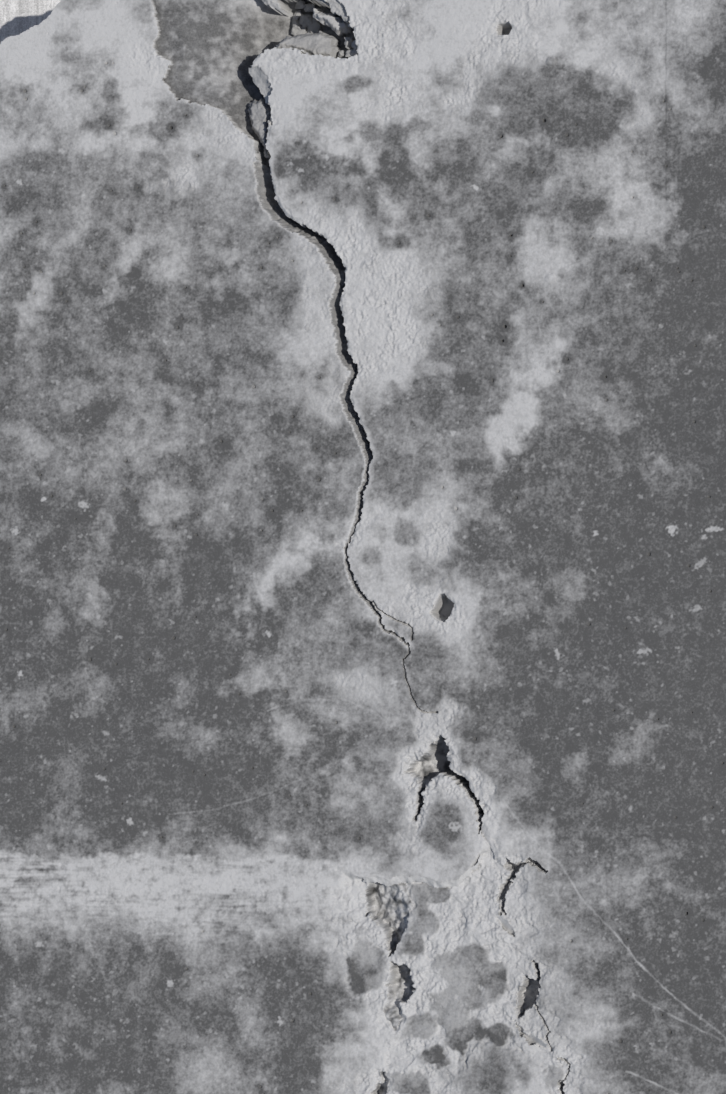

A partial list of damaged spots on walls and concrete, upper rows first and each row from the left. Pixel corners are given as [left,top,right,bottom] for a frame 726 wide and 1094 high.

crack [253,160,548,937]
spalling [380,502,467,646]
spalling [334,694,633,1094]
crack [514,960,571,1094]